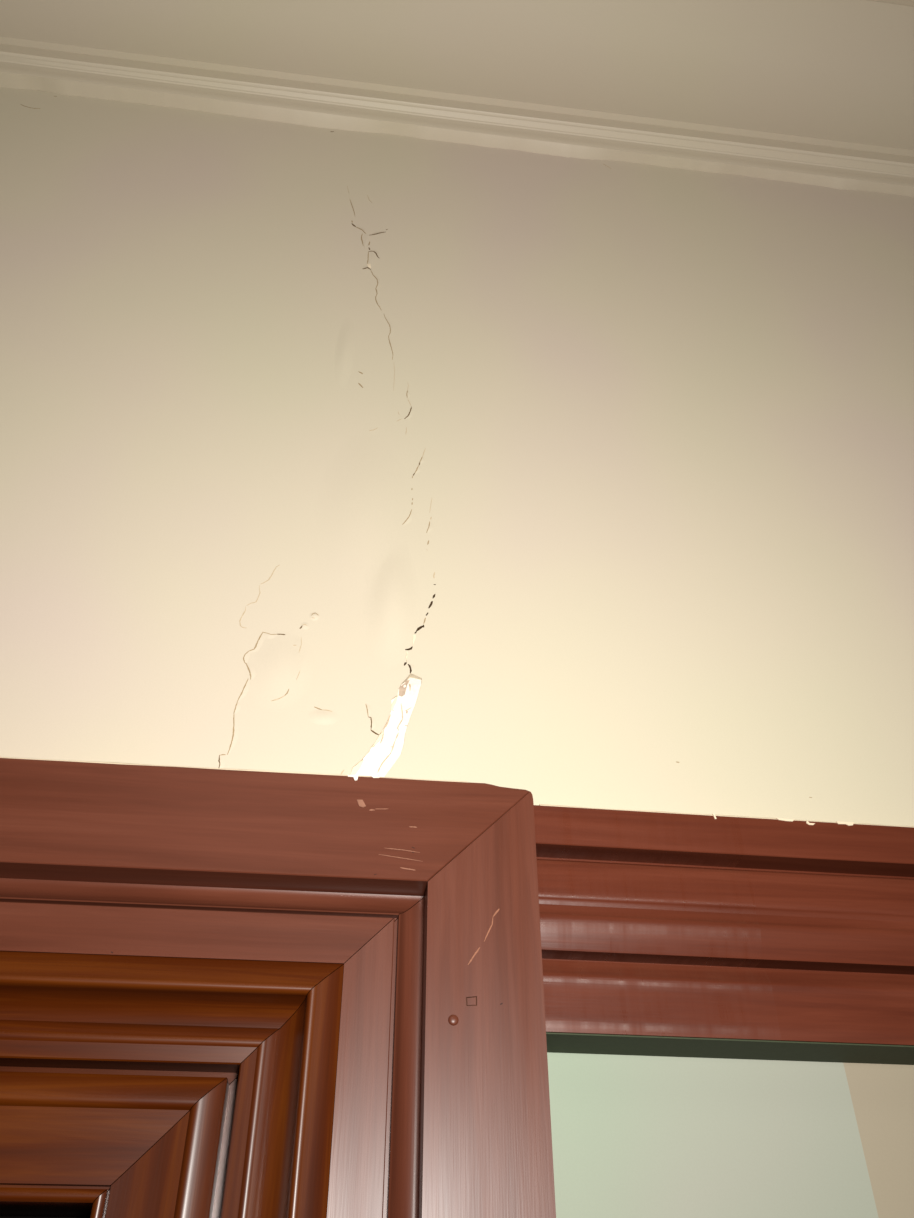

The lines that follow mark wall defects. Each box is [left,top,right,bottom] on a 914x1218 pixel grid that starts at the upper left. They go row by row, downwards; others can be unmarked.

crack [347,186,436,674]
crack [218,565,285,768]
crack [366,704,379,735]
flaking render [340,674,422,777]